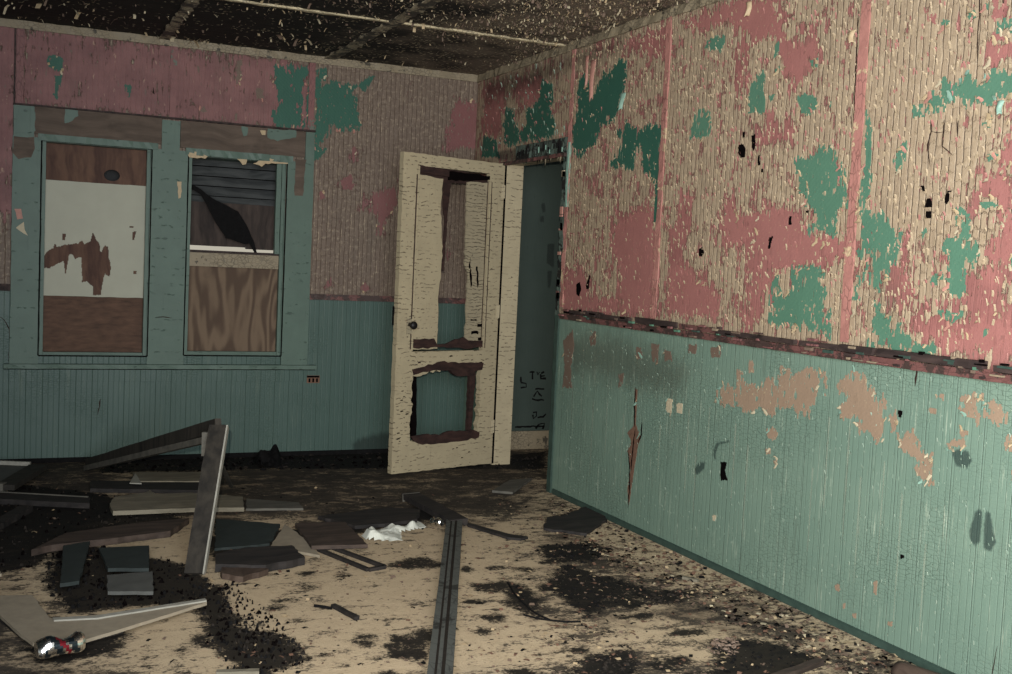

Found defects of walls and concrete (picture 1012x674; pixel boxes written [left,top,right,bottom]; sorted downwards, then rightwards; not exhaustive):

peeling [47,55,66,100]
peeling [1,0,209,48]
peeling [214,0,689,161]
peeling [685,0,831,118]
peeling [44,233,111,295]
peeling [558,57,742,389]
peeling [714,0,1012,487]
peeling [665,398,683,415]